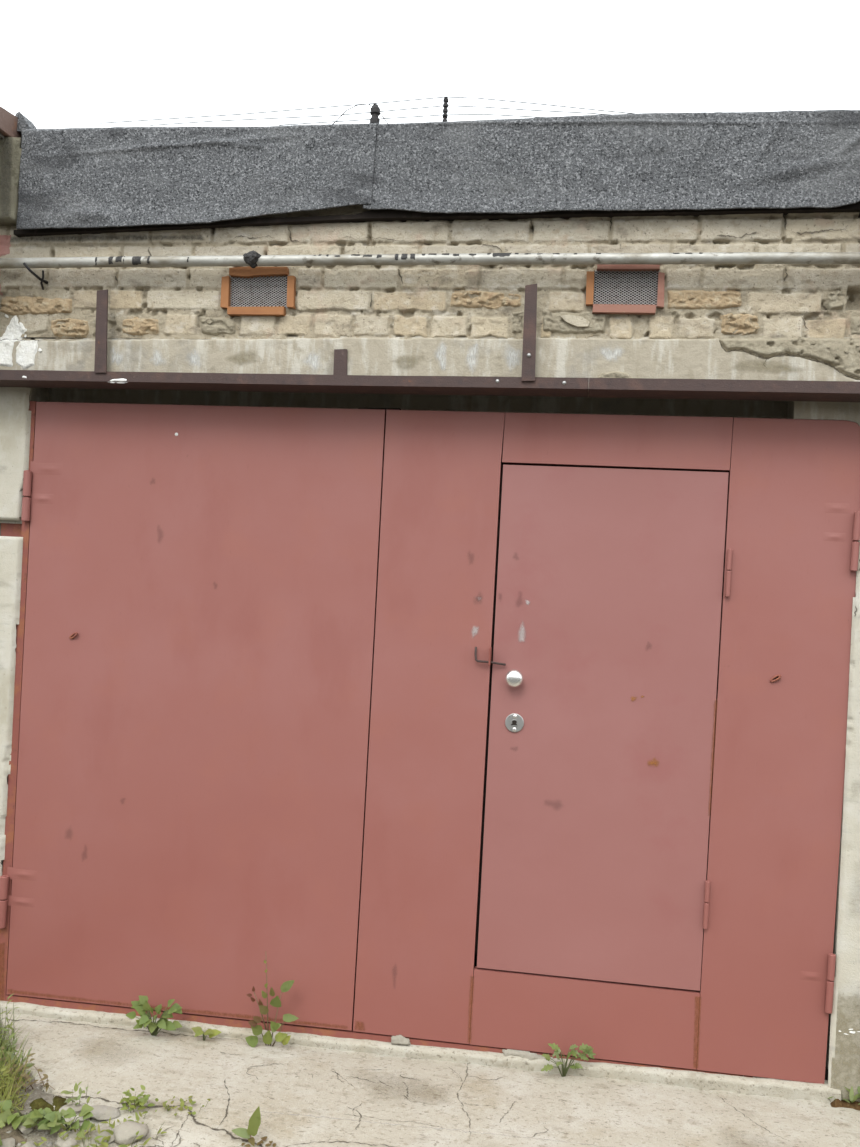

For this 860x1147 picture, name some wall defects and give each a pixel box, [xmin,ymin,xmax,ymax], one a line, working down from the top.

damp [831,998,860,1102]
crack [42,1052,432,1147]
crack [449,1064,515,1139]